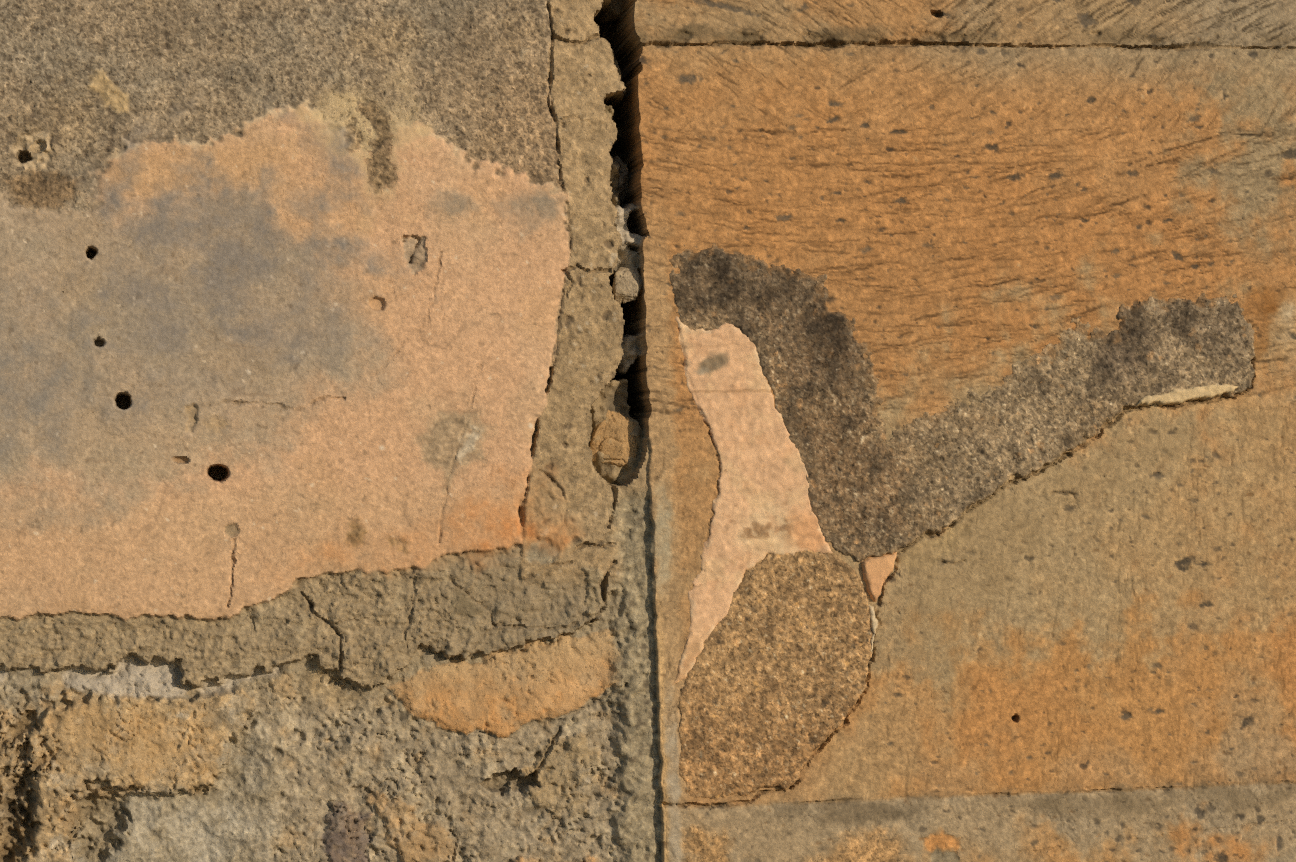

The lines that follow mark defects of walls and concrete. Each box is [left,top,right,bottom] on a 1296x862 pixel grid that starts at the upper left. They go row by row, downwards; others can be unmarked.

crack [545,0,602,205]
spalling [3,129,82,213]
spalling [345,100,399,194]
peeling [399,234,428,276]
crack [372,249,444,378]
crack [198,394,346,412]
spalling [413,410,491,493]
flaking render [669,243,1255,799]
peeling [583,566,604,619]
spalling [59,655,291,701]
hole [0,777,39,862]
spalling [75,715,288,862]